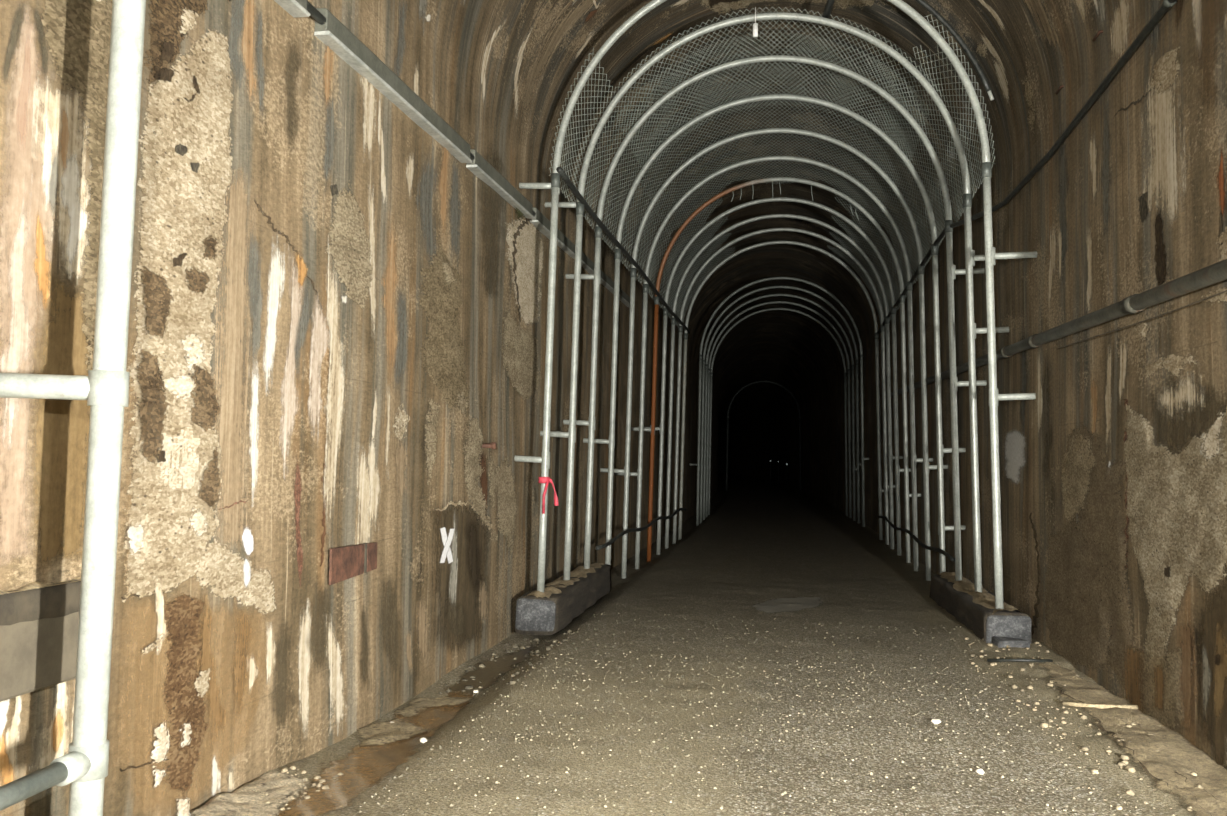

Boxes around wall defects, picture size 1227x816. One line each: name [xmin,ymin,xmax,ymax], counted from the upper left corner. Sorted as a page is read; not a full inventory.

spalling [41,0,113,373]
spalling [122,0,235,603]
peeling [423,398,441,485]
spalling [432,390,518,650]
spalling [1124,404,1227,658]
damp [247,587,344,726]
damp [384,581,428,669]
damp [479,587,487,618]
damp [212,757,234,795]